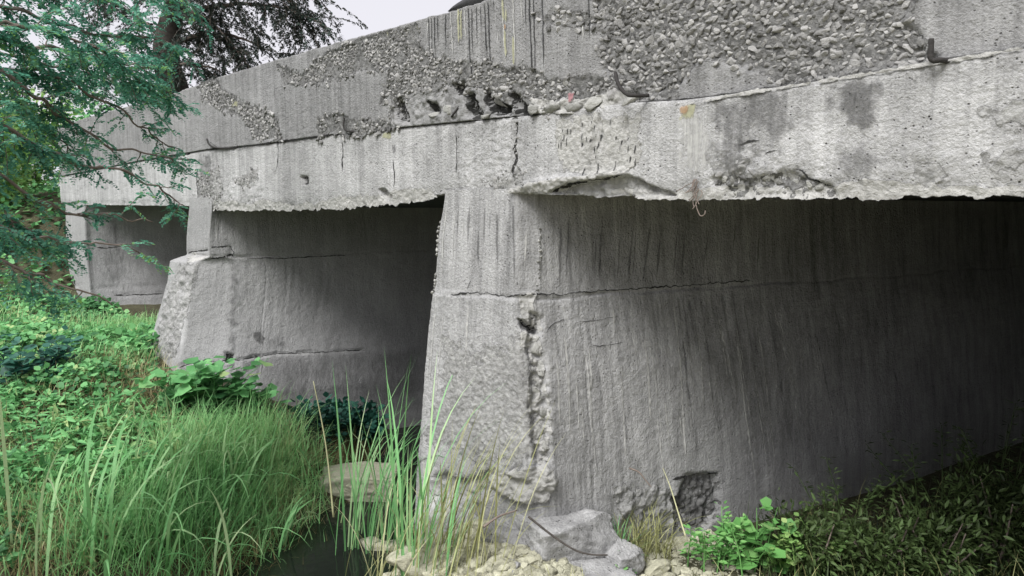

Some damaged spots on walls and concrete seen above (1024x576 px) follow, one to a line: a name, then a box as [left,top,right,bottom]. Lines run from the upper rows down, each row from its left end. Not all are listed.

spalling [196,77,284,143]
crack [512,113,541,174]
spalling [276,0,1024,201]
crack [451,279,750,347]
peeling [420,316,559,505]
spalling [613,473,721,532]